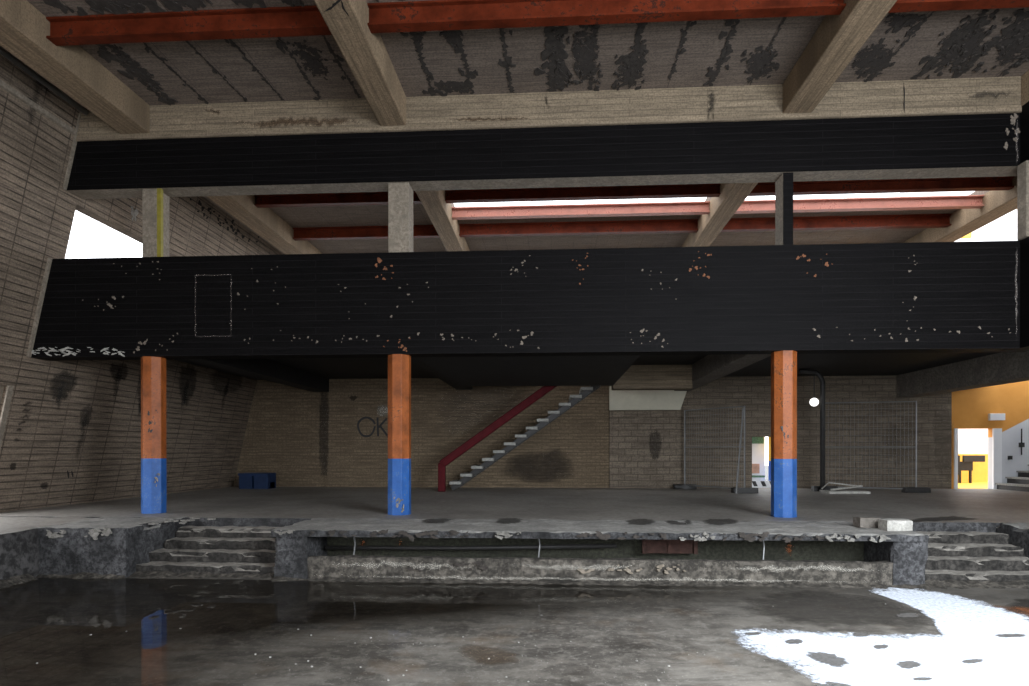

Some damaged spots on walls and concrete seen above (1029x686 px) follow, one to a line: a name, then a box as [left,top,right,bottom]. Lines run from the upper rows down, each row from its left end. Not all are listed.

spalling [32,333,178,357]
leakage [51,372,77,405]
leakage [319,392,328,468]